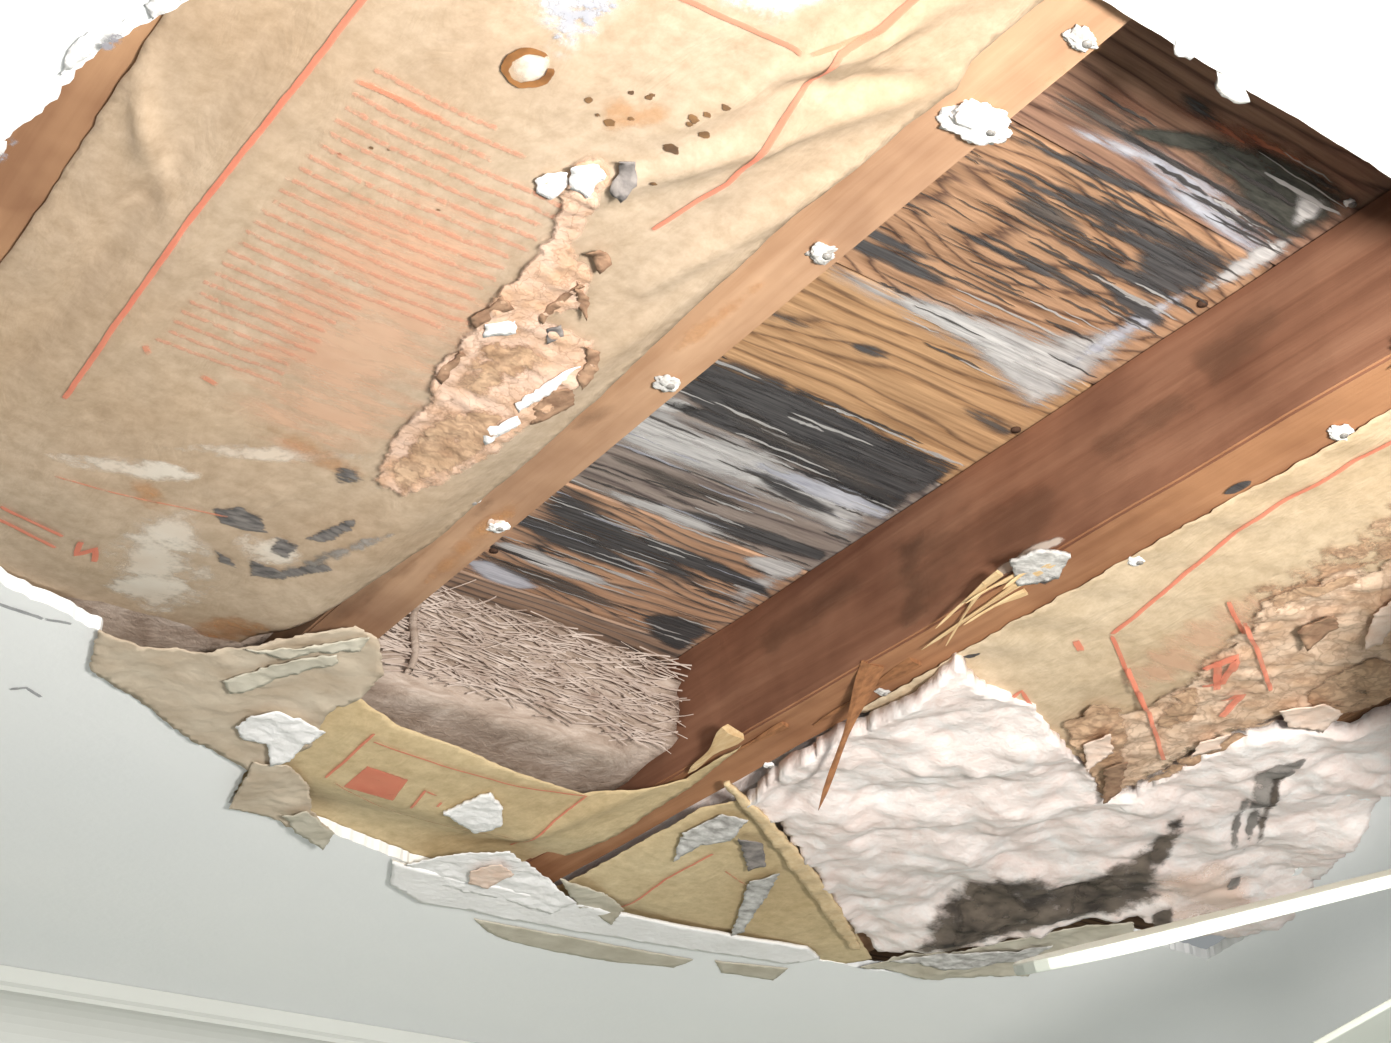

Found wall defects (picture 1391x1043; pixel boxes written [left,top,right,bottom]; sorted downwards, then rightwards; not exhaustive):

peeling [60,0,182,76]
peeling [0,141,16,161]
leakage [585,97,634,126]
leakage [663,144,679,155]
leakage [686,104,731,138]
leakage [853,92,1346,409]
leakage [469,356,963,650]
leakage [999,538,1062,574]
leakage [1232,759,1306,847]
peeling [390,859,820,980]
leakage [918,820,1182,953]
leakage [1228,876,1242,890]